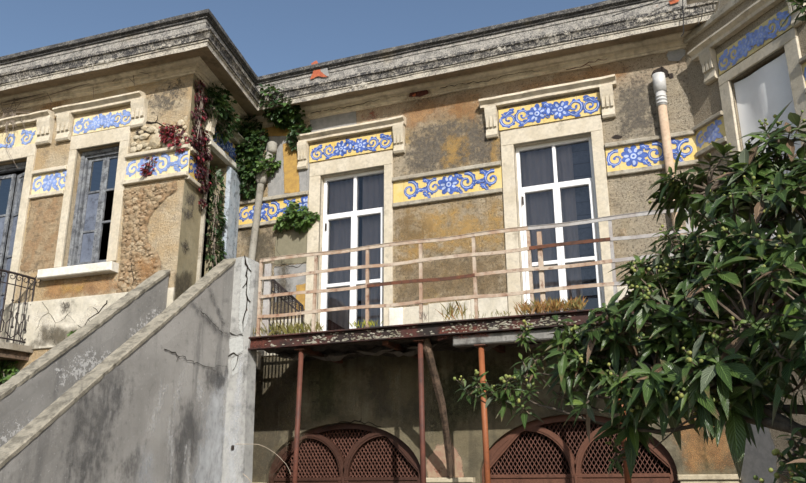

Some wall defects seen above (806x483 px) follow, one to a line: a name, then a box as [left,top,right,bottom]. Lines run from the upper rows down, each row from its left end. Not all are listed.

spalling [130,115,190,153]
spalling [116,180,177,293]
crack [36,300,108,342]
crack [164,255,251,371]
rust [250,338,267,348]
rust [439,326,488,338]
leakage [168,371,225,483]